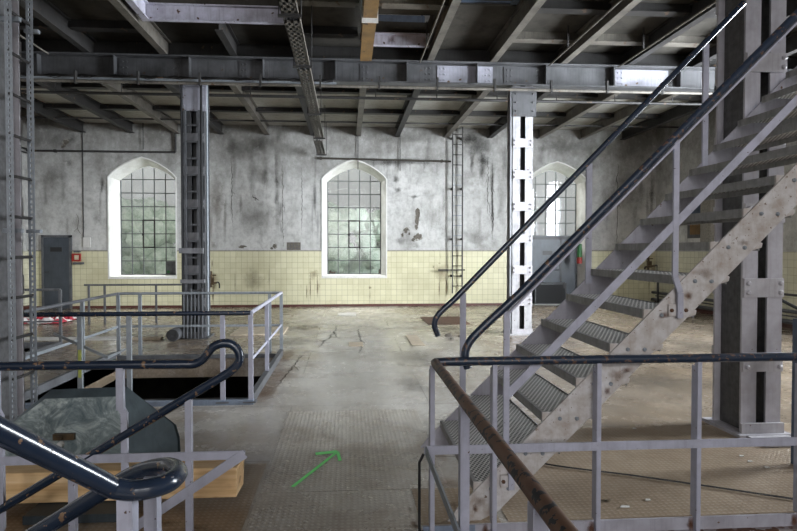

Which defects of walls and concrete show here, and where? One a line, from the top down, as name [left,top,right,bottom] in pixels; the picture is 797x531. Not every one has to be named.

crack [279,328,337,384]